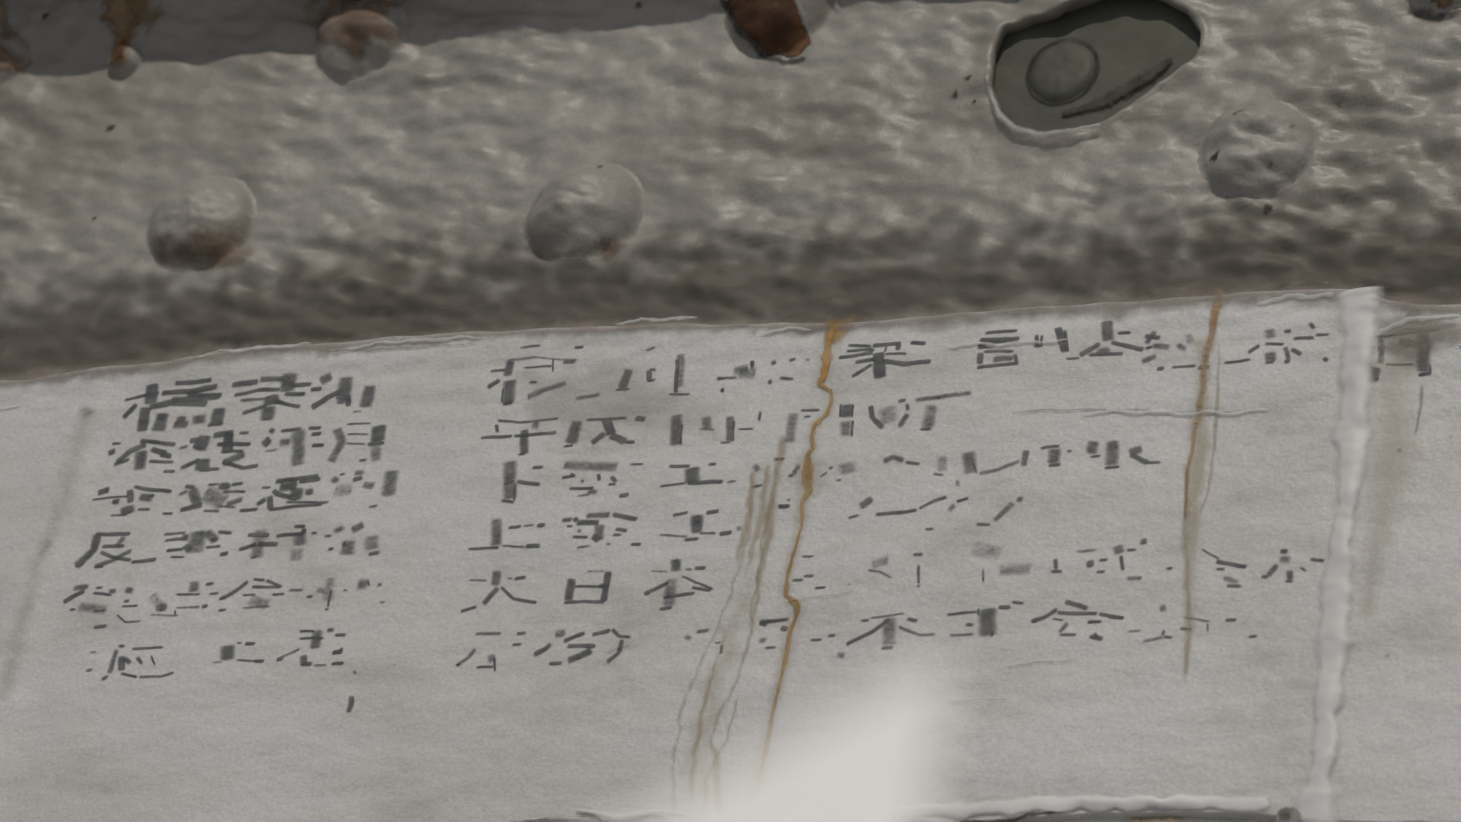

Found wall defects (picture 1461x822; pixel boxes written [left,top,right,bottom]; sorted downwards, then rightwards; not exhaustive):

rust [0,0,31,86]
rust [101,0,161,78]
rust [308,0,397,56]
rust [720,0,813,64]
rust [1185,291,1222,522]